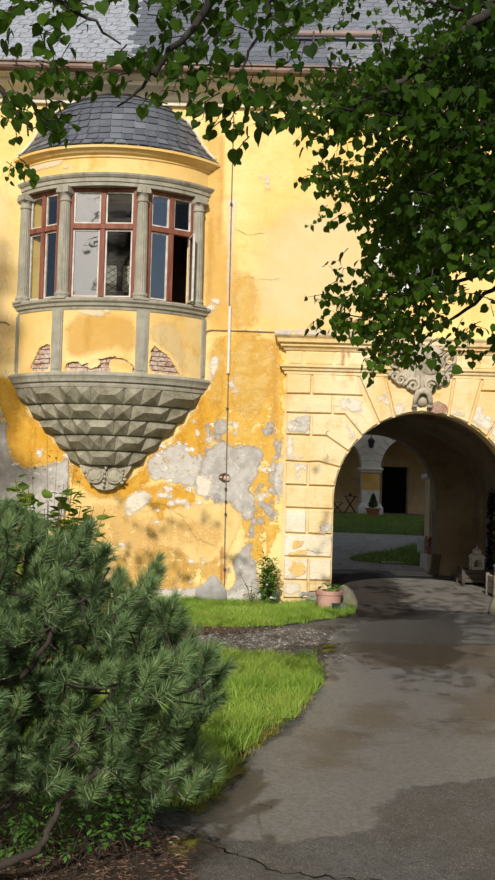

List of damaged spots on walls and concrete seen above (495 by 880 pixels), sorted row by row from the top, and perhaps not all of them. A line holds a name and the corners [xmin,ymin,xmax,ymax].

flaking render [31,345,51,372]
flaking render [66,357,134,372]
flaking render [149,346,179,375]
peeling [428,401,495,443]
flaking render [0,412,70,525]
flaking render [125,408,310,604]